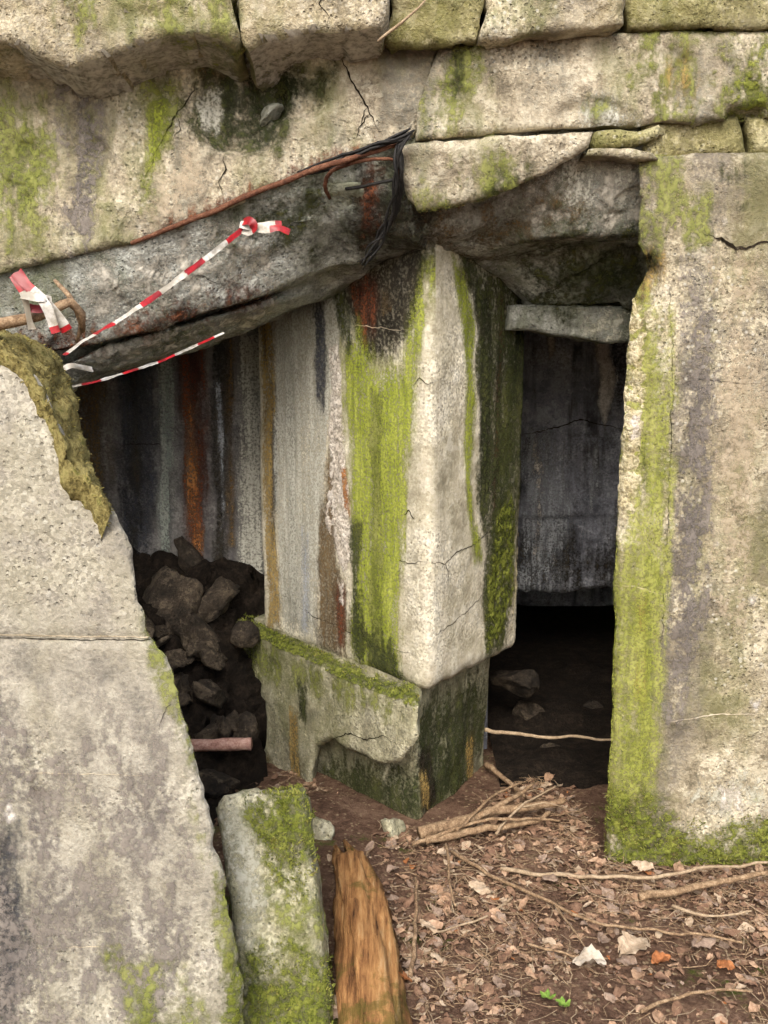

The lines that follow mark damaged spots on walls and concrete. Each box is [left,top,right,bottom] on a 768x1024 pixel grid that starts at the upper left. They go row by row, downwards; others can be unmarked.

crack [138,84,195,191]
crack [342,60,377,138]
crack [705,234,768,253]
corrosion [178,349,209,556]
leakage [76,154,642,681]
crack [521,419,620,436]
crack [399,532,489,577]